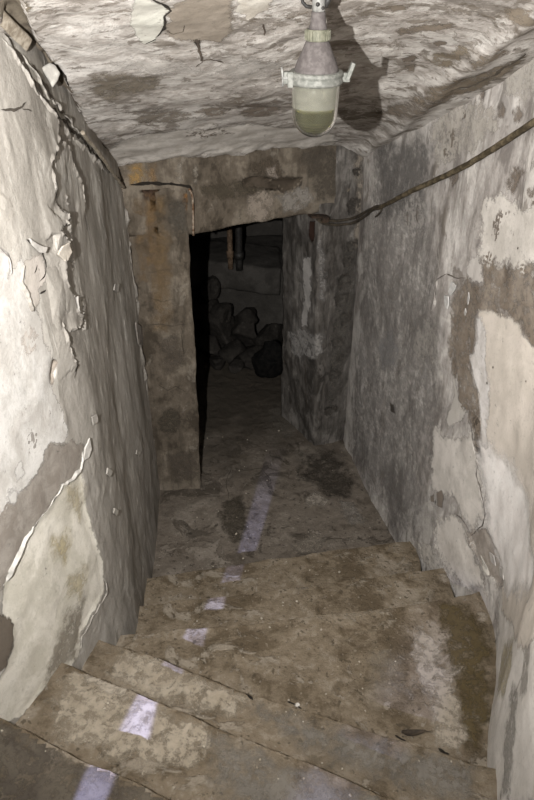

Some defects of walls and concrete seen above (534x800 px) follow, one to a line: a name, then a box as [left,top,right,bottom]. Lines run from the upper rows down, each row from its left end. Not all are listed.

spalling [0,0,88,122]
leakage [92,58,204,102]
spalling [130,0,273,44]
crack [194,39,223,67]
peeling [505,59,534,103]
leakage [109,102,339,222]
peeling [429,101,500,165]
peeling [466,188,534,285]
peeling [444,282,457,309]
spalling [0,247,108,722]
peeling [430,309,534,800]
spalling [86,674,127,694]